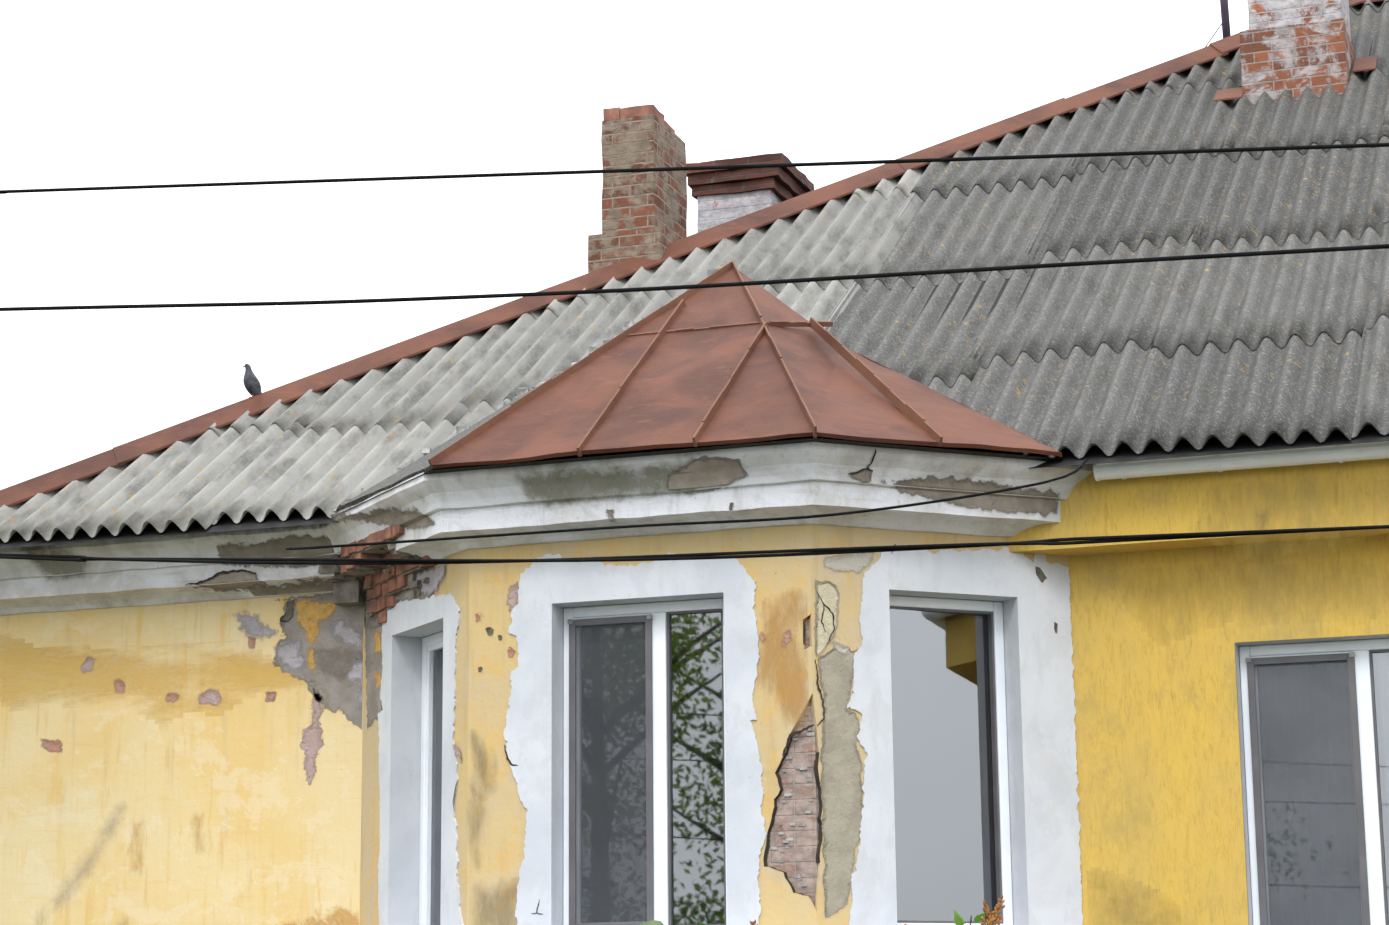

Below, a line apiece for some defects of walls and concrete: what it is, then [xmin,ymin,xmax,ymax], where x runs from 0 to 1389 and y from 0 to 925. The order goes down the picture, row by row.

flaking render [667,456,748,494]
peeling [848,449,1059,517]
flaking render [185,507,446,785]
flaking render [763,580,849,896]